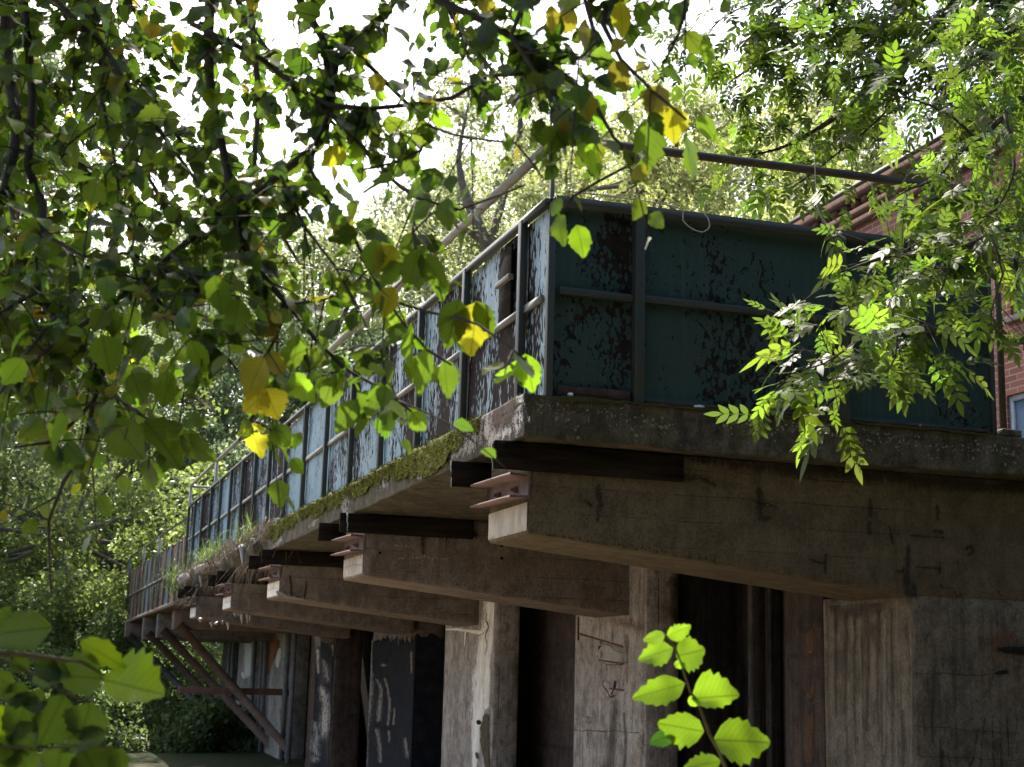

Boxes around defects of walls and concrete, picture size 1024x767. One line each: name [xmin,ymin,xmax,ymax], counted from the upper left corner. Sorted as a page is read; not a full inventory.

rust [267,635,280,675]
peeling [304,646,334,762]
peeling [366,640,409,766]